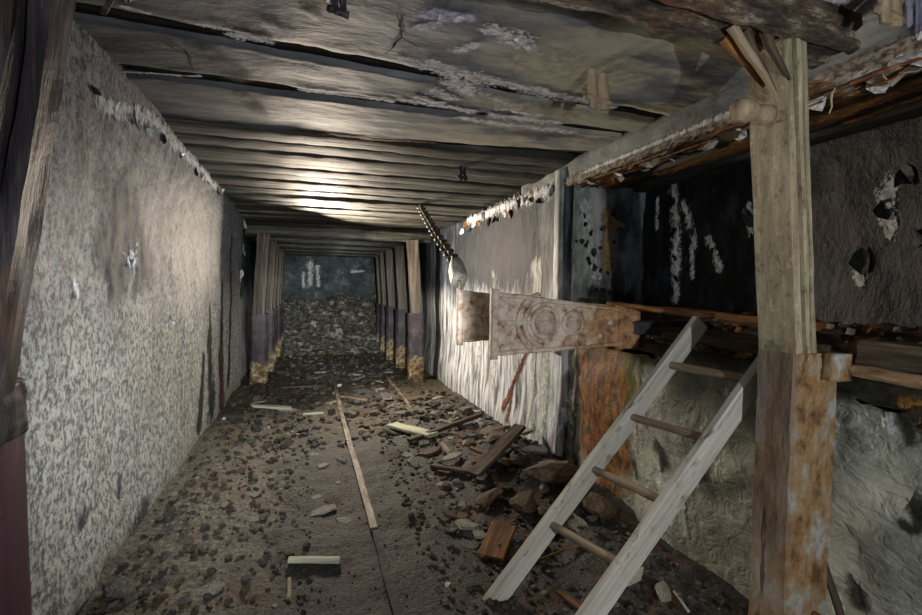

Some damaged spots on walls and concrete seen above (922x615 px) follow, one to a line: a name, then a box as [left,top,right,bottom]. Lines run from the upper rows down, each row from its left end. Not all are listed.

crack [384,13,418,56]
efflorescence [654,184,698,304]
water stain [898,491,922,534]
water stain [848,574,867,611]